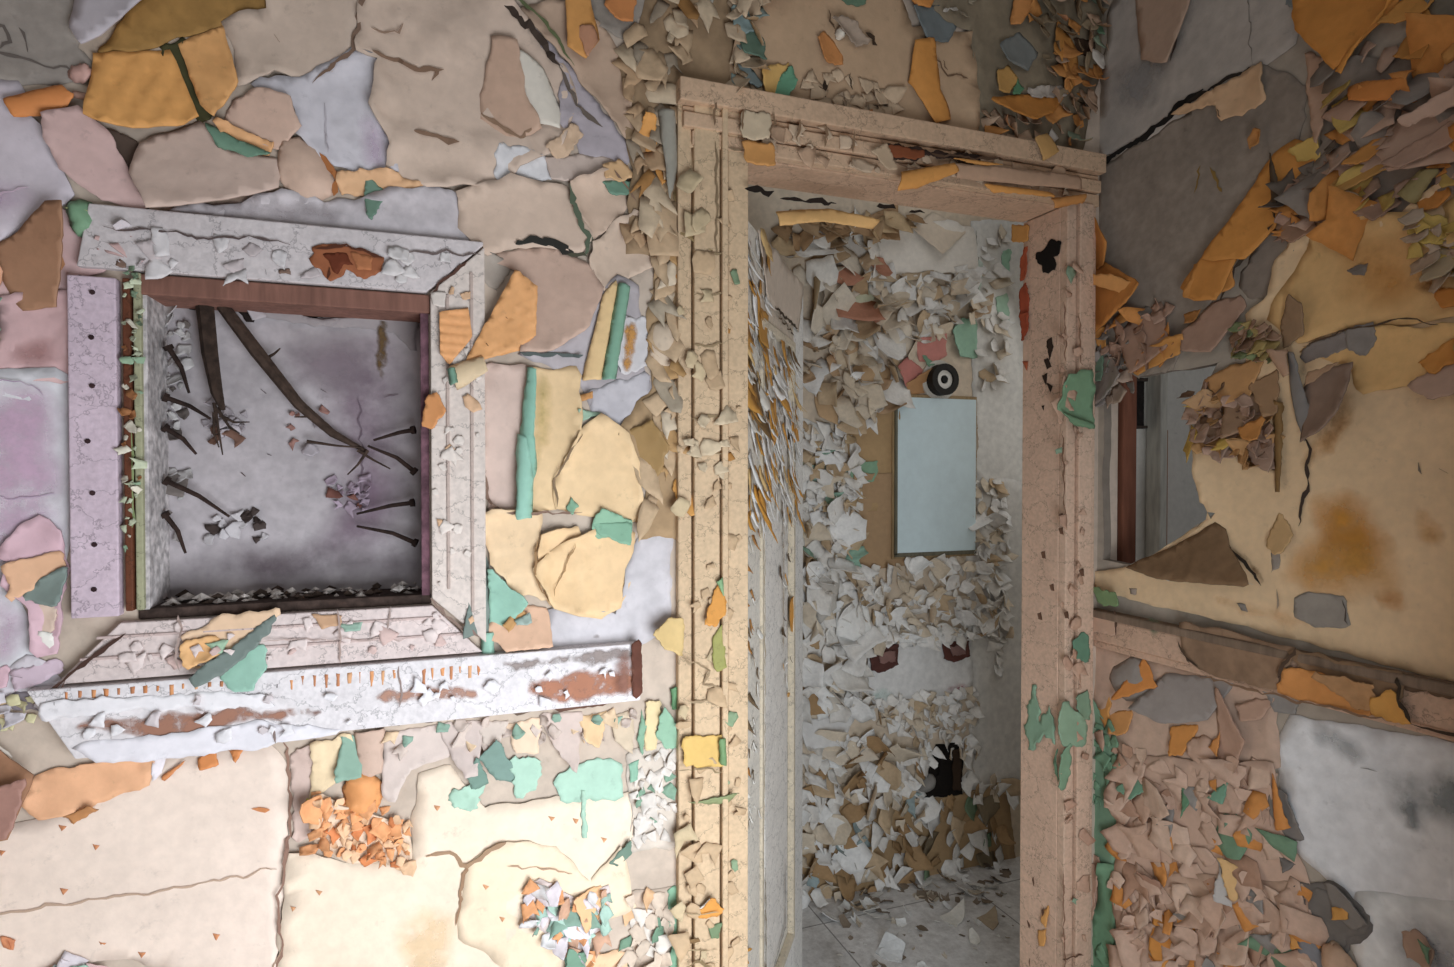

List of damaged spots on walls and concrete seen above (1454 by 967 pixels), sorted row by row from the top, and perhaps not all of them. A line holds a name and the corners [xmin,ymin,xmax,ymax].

crack [1106,0,1253,164]
crack [1303,317,1438,347]
peeling [421,392,465,471]
peeling [431,0,1454,967]
crack [1299,439,1312,525]
rust [617,639,643,699]
peeling [0,515,765,967]